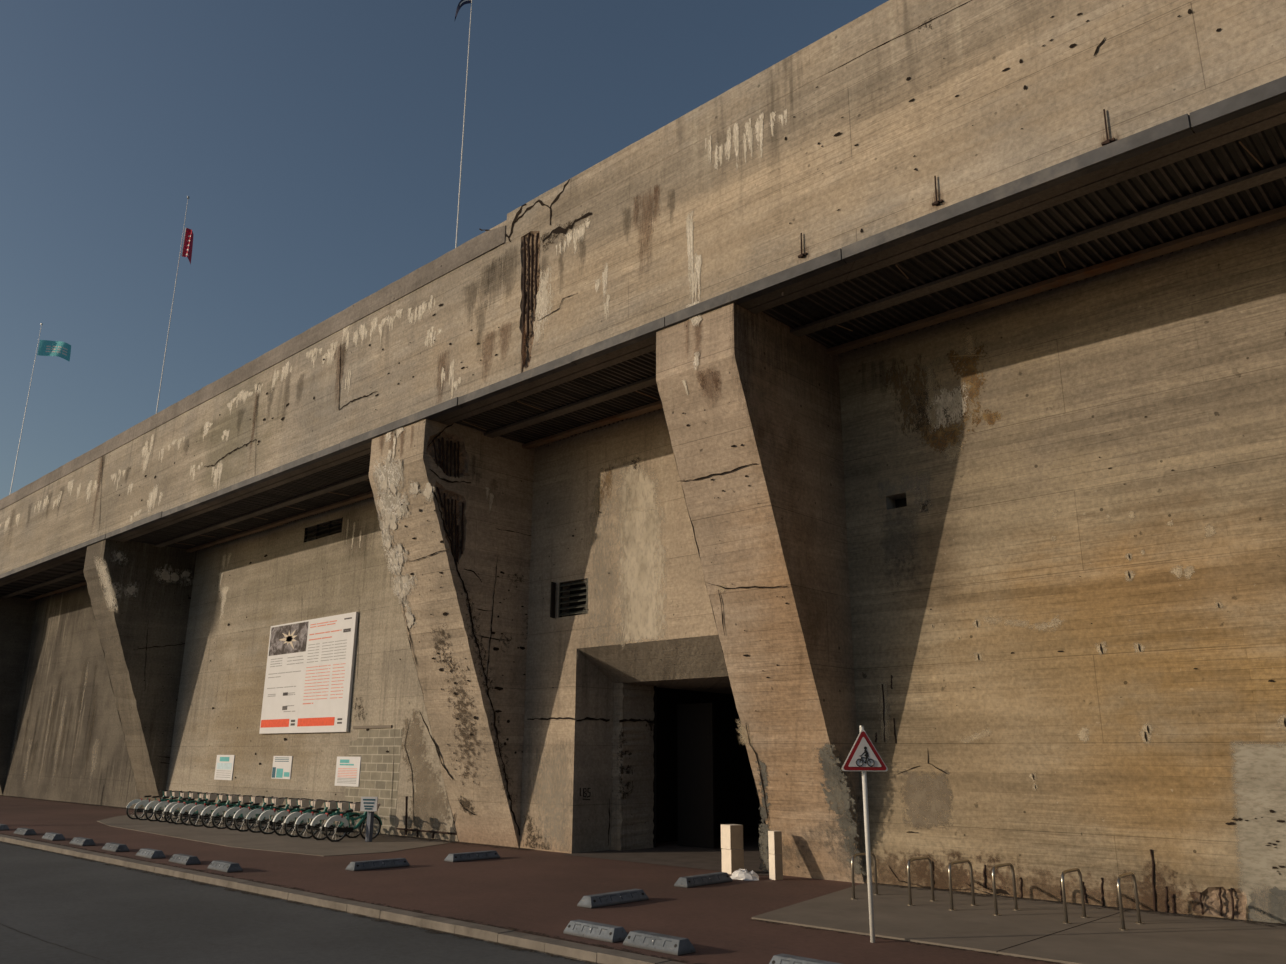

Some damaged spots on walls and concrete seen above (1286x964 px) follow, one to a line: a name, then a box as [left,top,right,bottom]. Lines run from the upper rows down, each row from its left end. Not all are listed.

leakage [705,109,787,170]
crack [471,179,592,261]
leakage [227,360,292,413]
leakage [306,295,442,398]
leakage [441,359,461,398]
spalling [886,332,1001,461]
spalling [372,423,488,839]
crack [406,490,656,836]